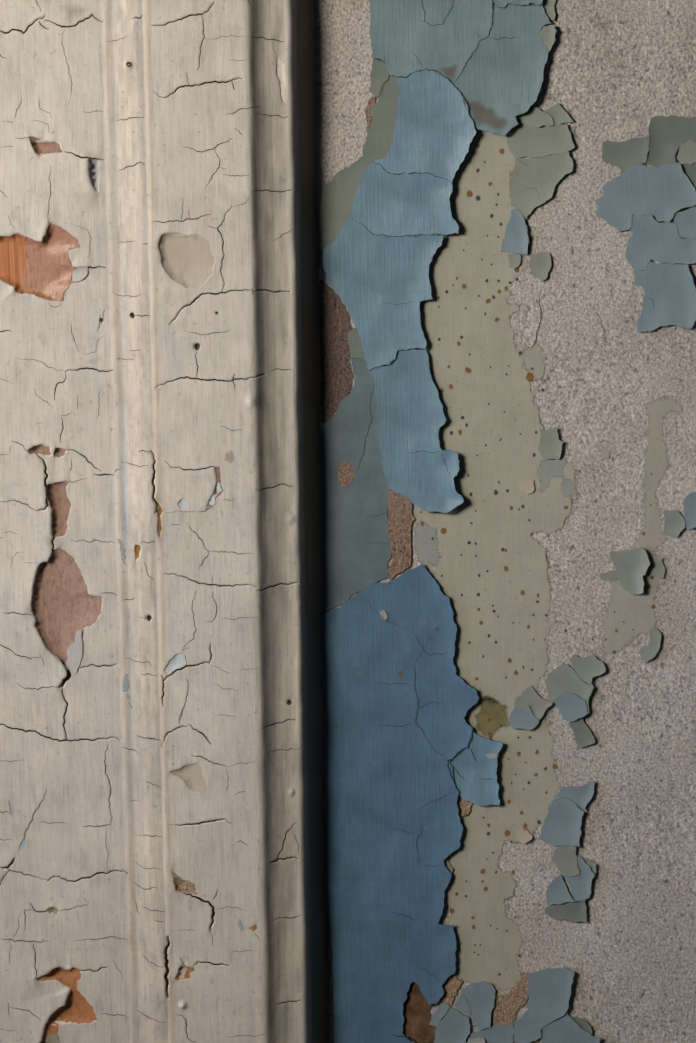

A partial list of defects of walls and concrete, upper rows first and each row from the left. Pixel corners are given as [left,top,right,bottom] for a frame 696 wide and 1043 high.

peeling [31,137,63,156]
peeling [0,224,88,301]
peeling [316,0,696,1043]
peeling [33,482,102,674]
peeling [173,872,198,895]
peeling [37,967,98,1043]